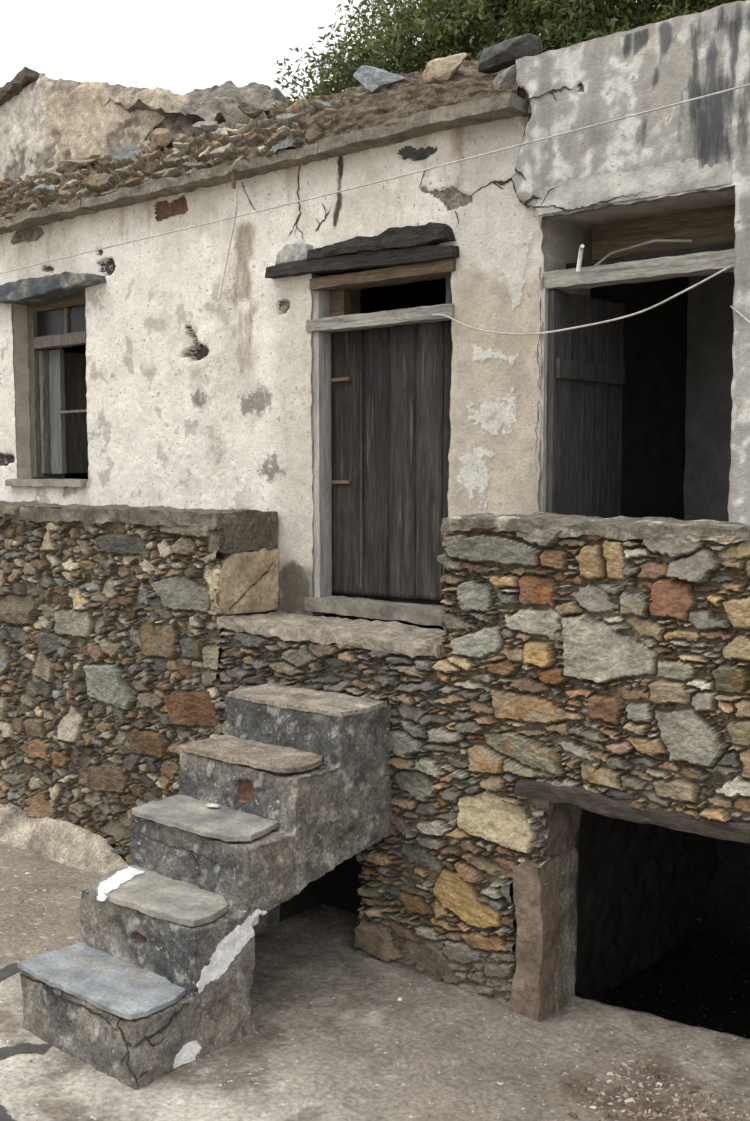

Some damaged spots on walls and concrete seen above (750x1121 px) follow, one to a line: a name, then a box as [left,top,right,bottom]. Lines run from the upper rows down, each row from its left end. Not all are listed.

water stain [624,22,671,86]
water stain [689,7,750,166]
spalling [397,146,437,161]
crack [455,86,651,227]
spalling [11,227,44,245]
spalling [154,195,188,221]
crack [287,166,331,238]